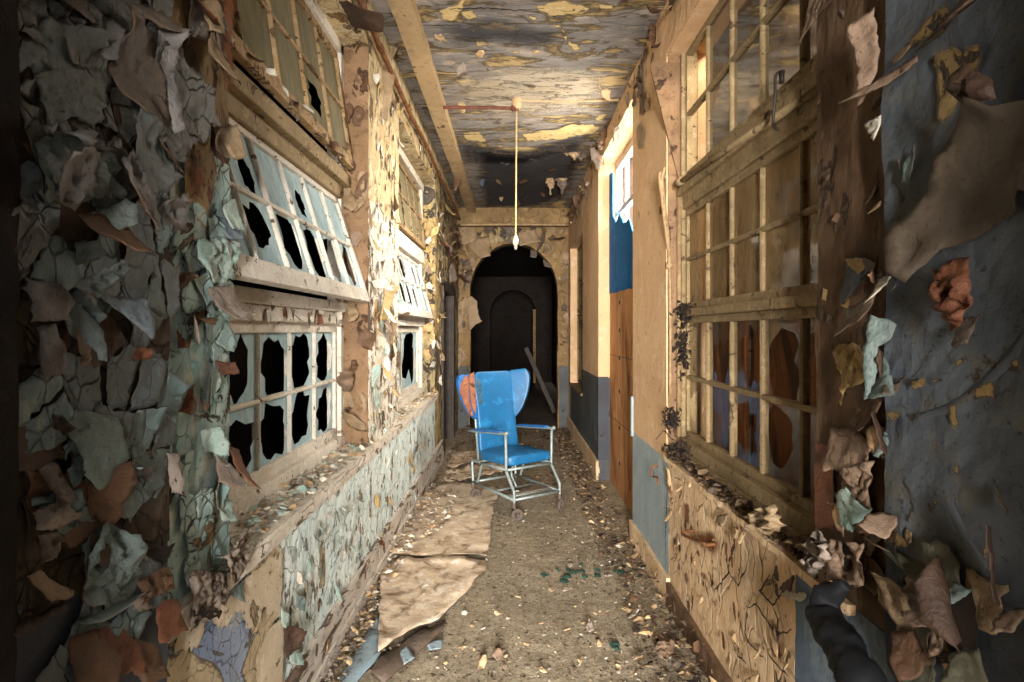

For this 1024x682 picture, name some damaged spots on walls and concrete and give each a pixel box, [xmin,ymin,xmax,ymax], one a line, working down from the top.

peeling [10,0,437,682]